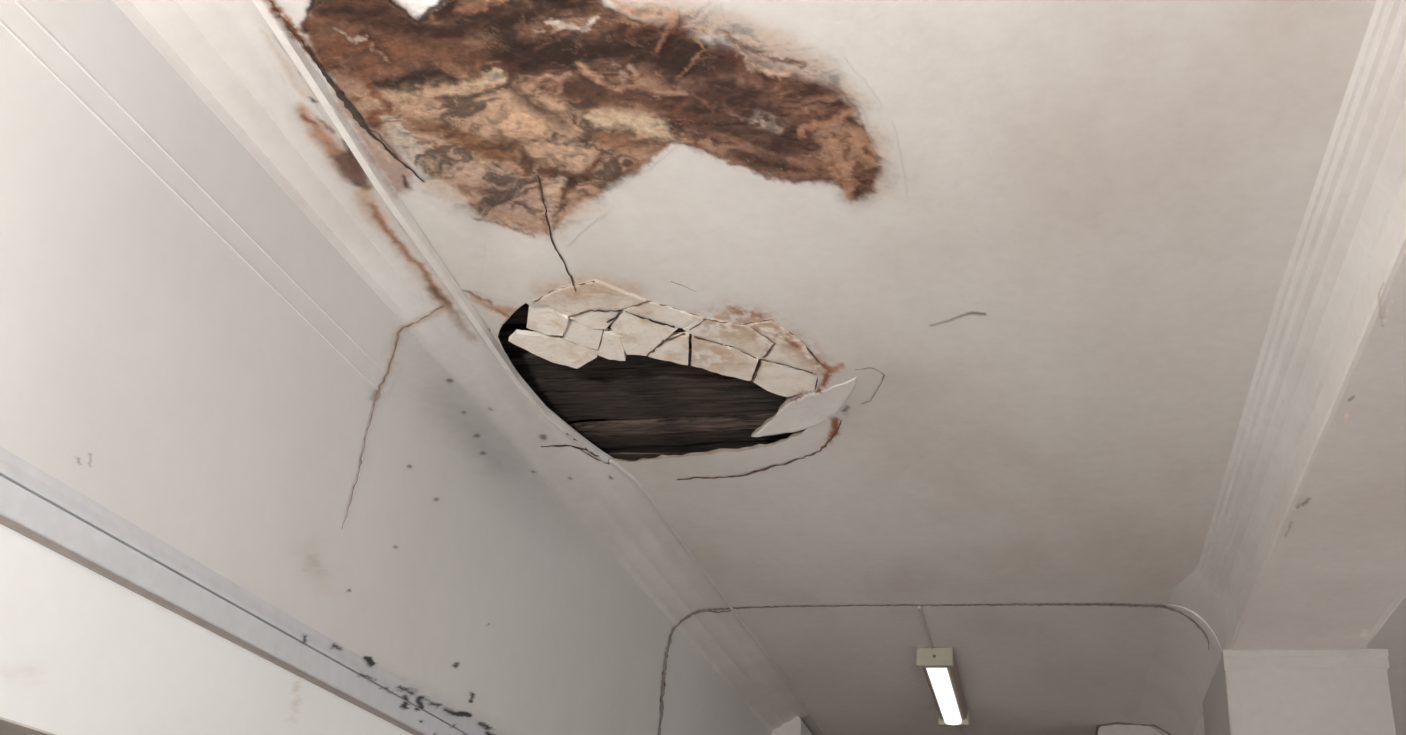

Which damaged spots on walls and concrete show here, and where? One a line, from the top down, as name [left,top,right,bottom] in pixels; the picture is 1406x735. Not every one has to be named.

crack [295,34,424,182]
leakage [293,0,908,246]
crack [342,302,453,529]
crack [532,175,821,381]
flaking render [503,280,856,437]
crack [677,367,885,480]